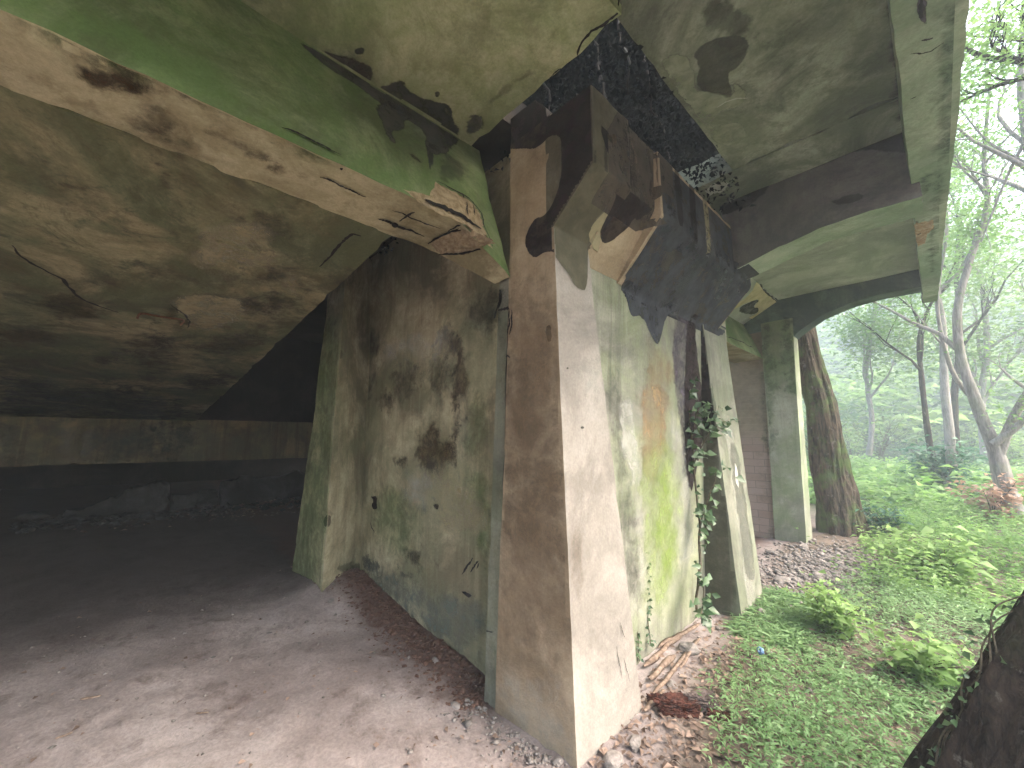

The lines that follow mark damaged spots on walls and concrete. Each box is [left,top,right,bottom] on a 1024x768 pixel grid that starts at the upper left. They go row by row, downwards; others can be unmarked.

water stain [695,35,749,97]
crack [282,127,366,197]
water stain [814,132,905,168]
crack [319,181,493,267]
crack [12,245,119,313]
water stain [510,85,768,615]